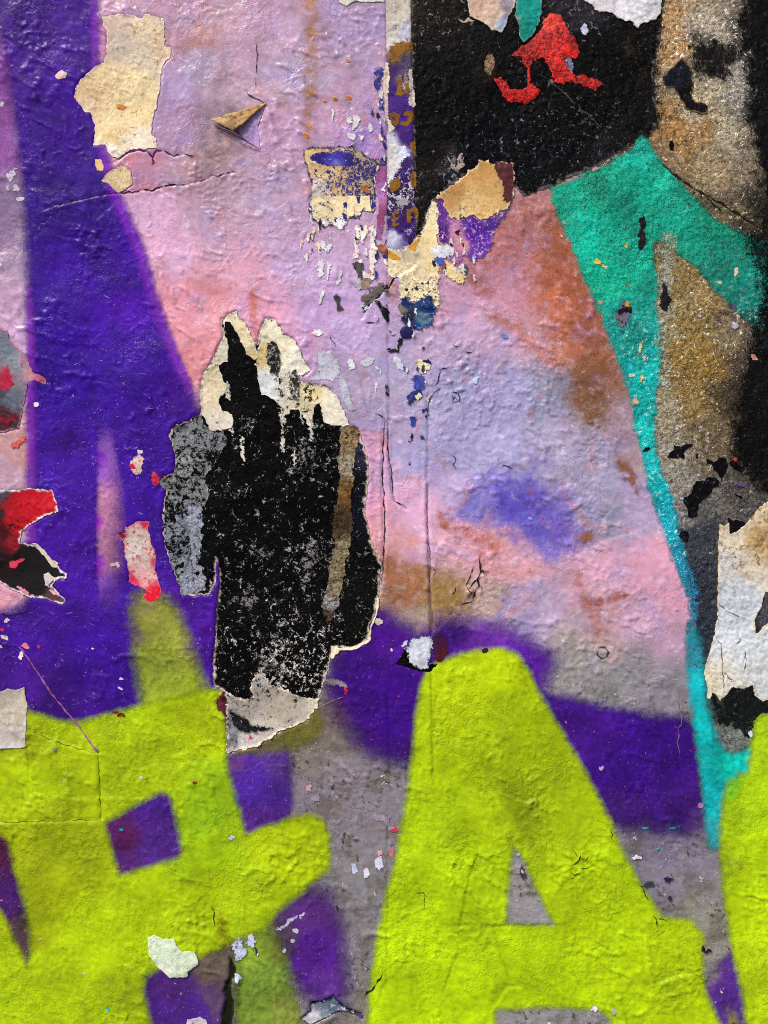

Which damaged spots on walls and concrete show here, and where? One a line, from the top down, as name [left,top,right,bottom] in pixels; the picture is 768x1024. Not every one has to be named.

peeling [74,14,171,193]
crack [49,149,234,208]
peeling [447,153,465,173]
peeling [442,238,477,283]
peeling [109,521,161,602]
peeling [390,634,448,672]
peeling [325,678,349,695]